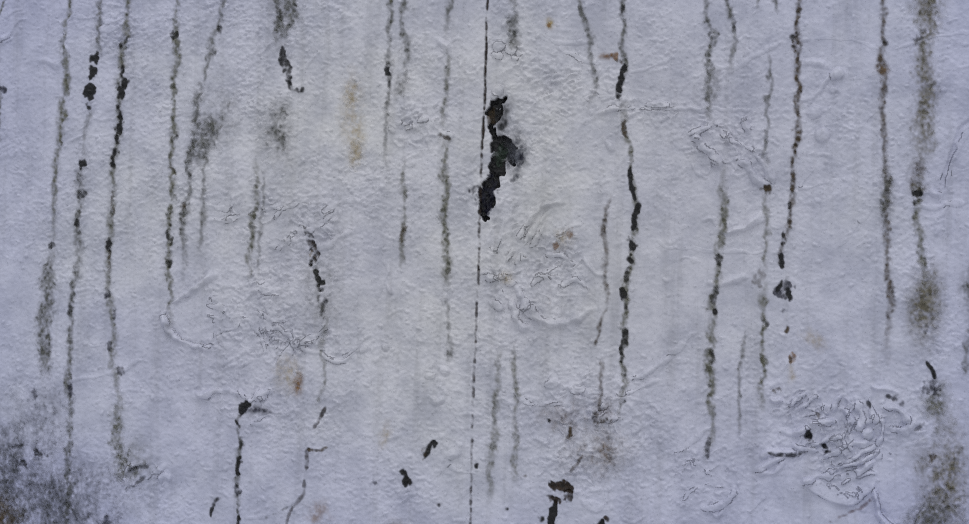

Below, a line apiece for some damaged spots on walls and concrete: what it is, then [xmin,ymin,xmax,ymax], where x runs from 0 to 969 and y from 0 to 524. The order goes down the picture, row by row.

leakage [83,2,101,110]
leakage [110,0,130,184]
leakage [166,27,218,290]
leakage [278,46,304,92]
peeling [469,96,525,222]
leakage [616,1,628,99]
leakage [779,7,802,269]
leakage [619,120,641,368]
leakage [760,281,795,384]
leakage [235,401,266,497]
leakage [400,470,412,487]
leakage [540,479,574,524]